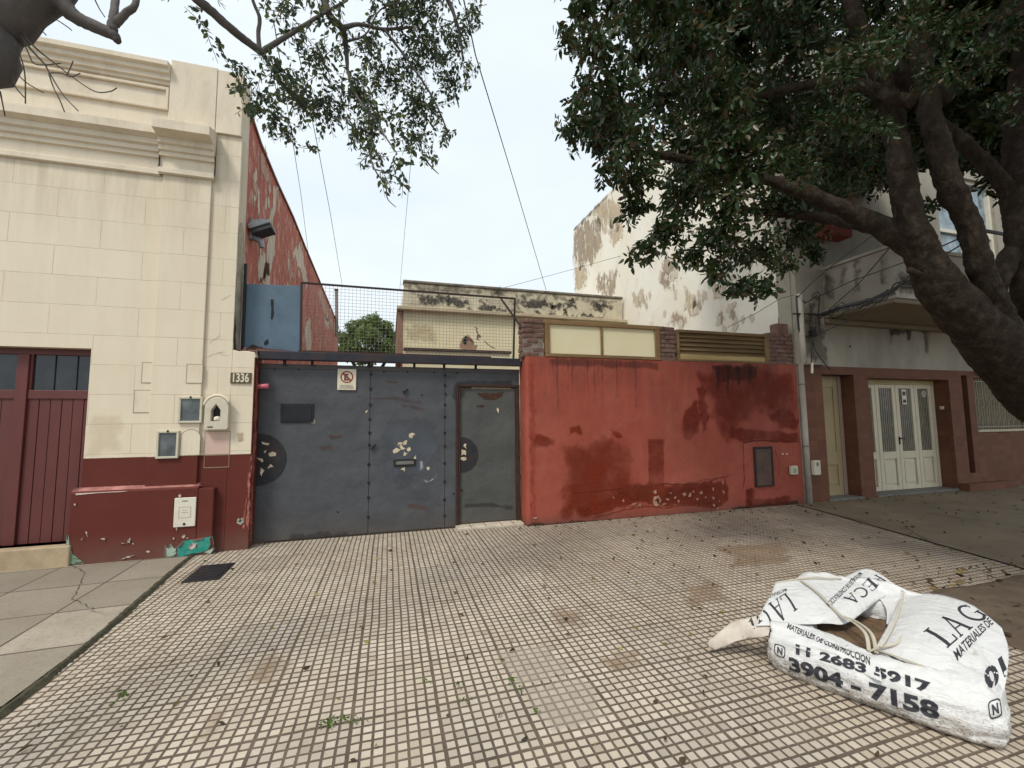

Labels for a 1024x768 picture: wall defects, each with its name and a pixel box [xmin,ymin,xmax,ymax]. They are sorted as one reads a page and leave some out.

peeling [287,241,308,288]
peeling [573,200,623,296]
peeling [633,253,755,332]
flaking render [234,144,279,542]
water stain [683,364,798,442]
water stain [527,432,647,527]
peeling [66,531,88,564]
peeling [165,527,214,558]